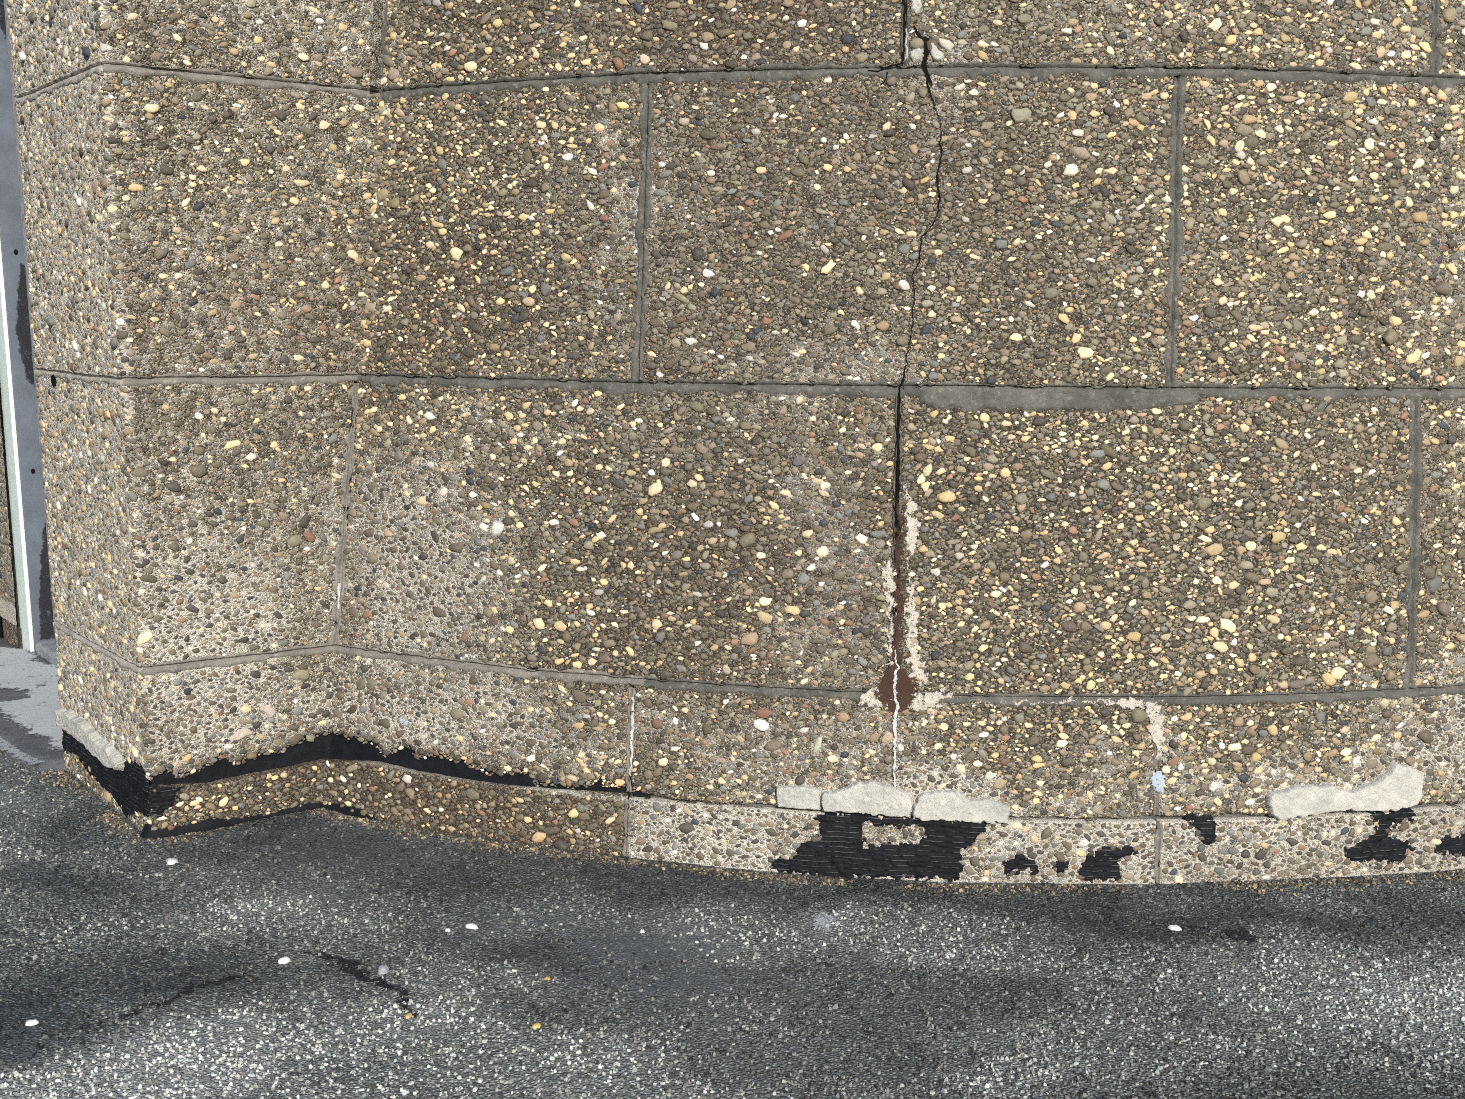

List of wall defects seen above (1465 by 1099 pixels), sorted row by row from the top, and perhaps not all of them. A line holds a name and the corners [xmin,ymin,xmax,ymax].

crack [868,0,944,579]
corrosion [874,498,918,787]
leakage [858,485,1166,795]
spalling [62,729,651,818]
peeling [771,811,989,882]
peeling [1002,845,1138,883]
peeling [1186,811,1217,845]
peeling [1344,808,1416,867]
peeling [1434,833,1465,857]